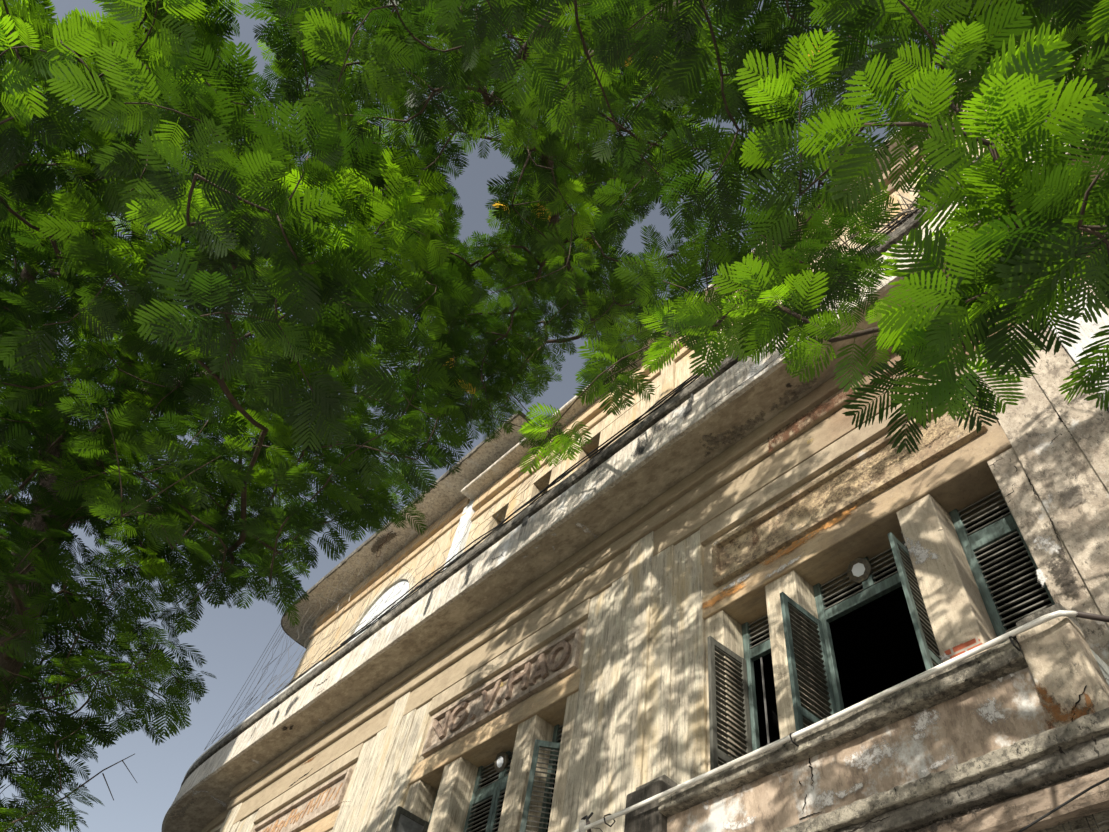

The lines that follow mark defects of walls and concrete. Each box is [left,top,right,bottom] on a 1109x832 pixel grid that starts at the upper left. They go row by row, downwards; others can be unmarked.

crack [987,459,1062,548]
corrosion [1036,683,1095,729]
crack [1071,678,1109,745]
crack [799,758,820,820]